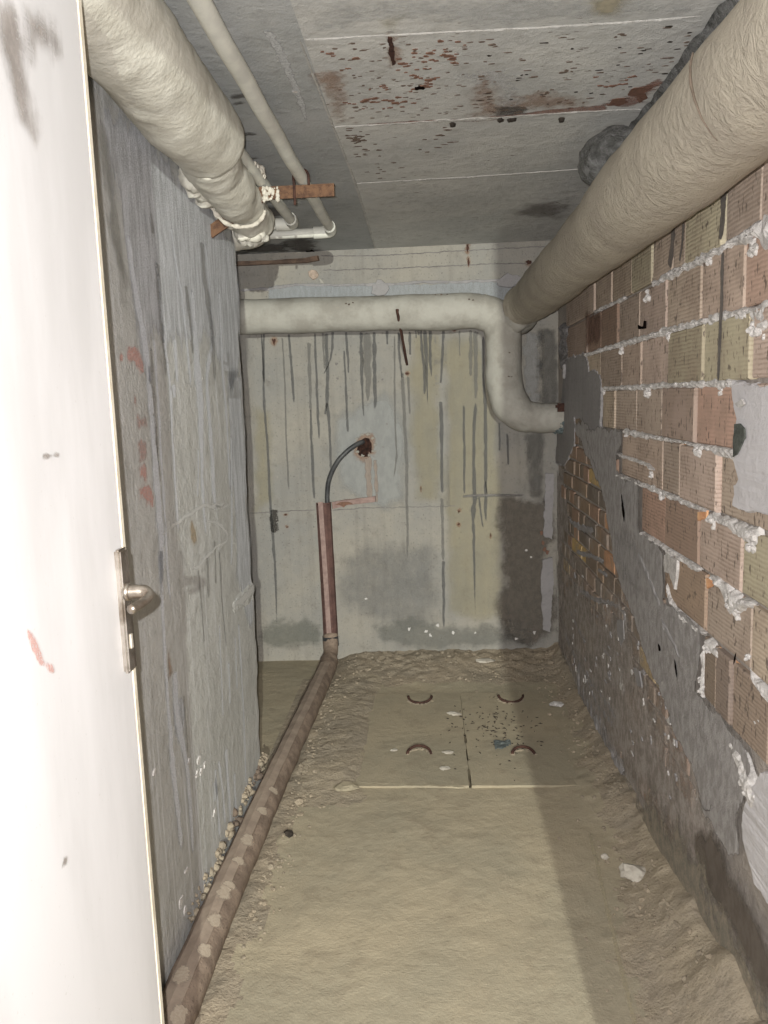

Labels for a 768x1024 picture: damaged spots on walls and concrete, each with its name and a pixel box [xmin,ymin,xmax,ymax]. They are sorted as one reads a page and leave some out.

corrosion [320,25,692,179]
damp [102,111,521,850]
damp [459,329,557,646]
peeling [540,322,603,632]
peeling [663,553,680,590]
peeling [731,380,768,515]